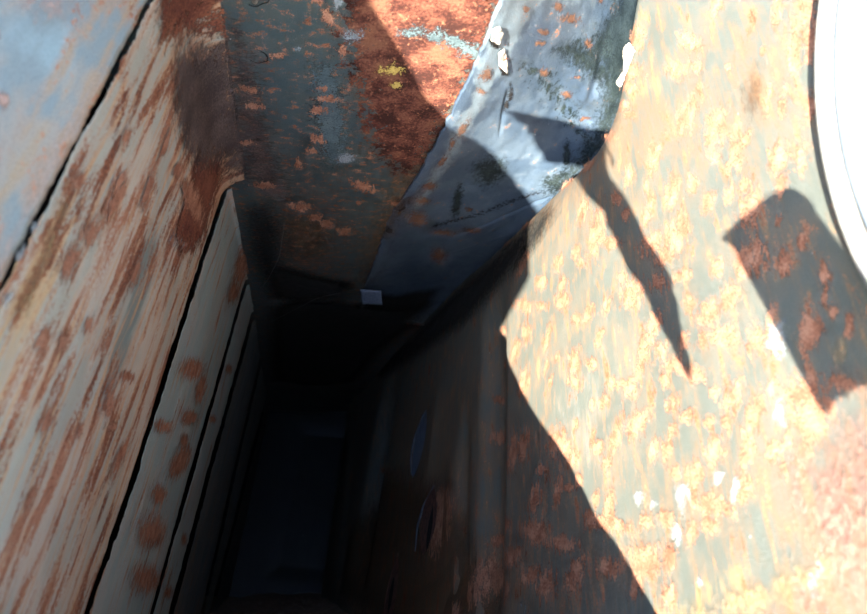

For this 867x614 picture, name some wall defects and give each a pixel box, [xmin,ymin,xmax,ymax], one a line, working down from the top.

corrosion [57,168,133,286]
corrosion [154,0,266,263]
corrosion [294,133,327,169]
corrosion [286,200,351,237]
corrosion [344,178,376,206]
corrosion [310,0,507,178]
corrosion [618,21,653,120]
corrosion [750,0,818,122]
corrosion [32,315,94,363]
corrosion [103,370,135,485]
corrosion [125,355,208,602]
corrosion [452,134,867,614]